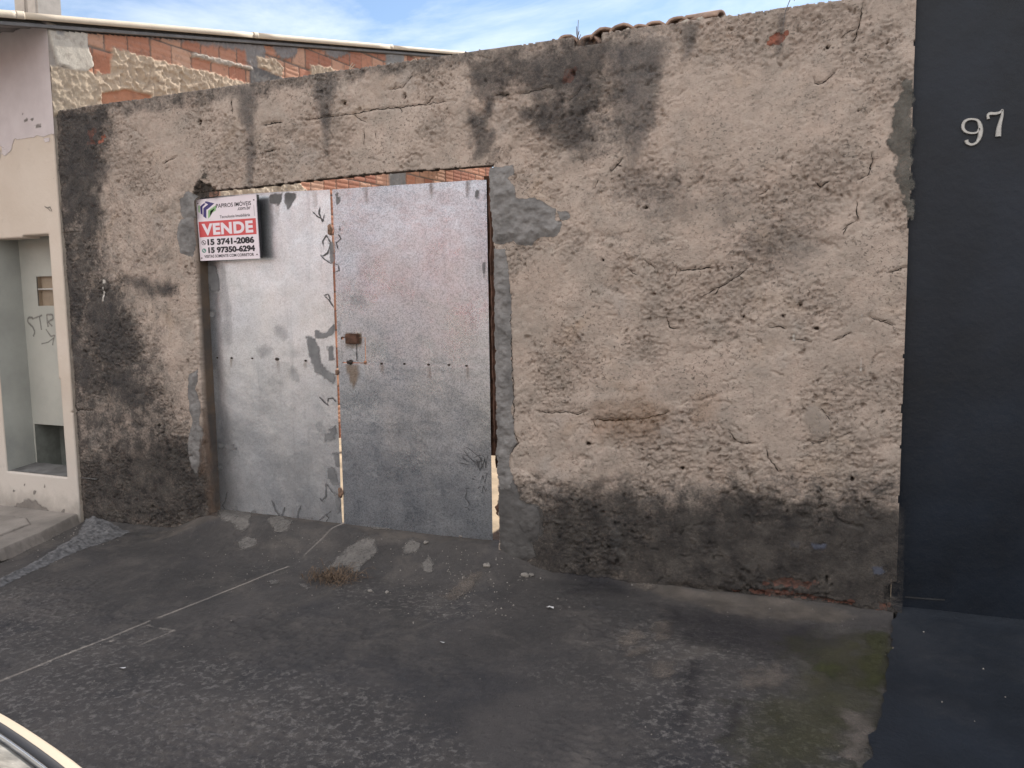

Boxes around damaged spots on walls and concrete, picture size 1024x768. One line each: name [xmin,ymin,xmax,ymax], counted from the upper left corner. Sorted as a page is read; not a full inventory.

peeling [0,21,54,156]
crack [265,76,456,152]
damp [468,46,603,156]
damp [61,107,108,237]
crack [627,260,748,300]
crack [542,411,669,427]
damp [84,443,212,525]
damp [536,479,902,614]